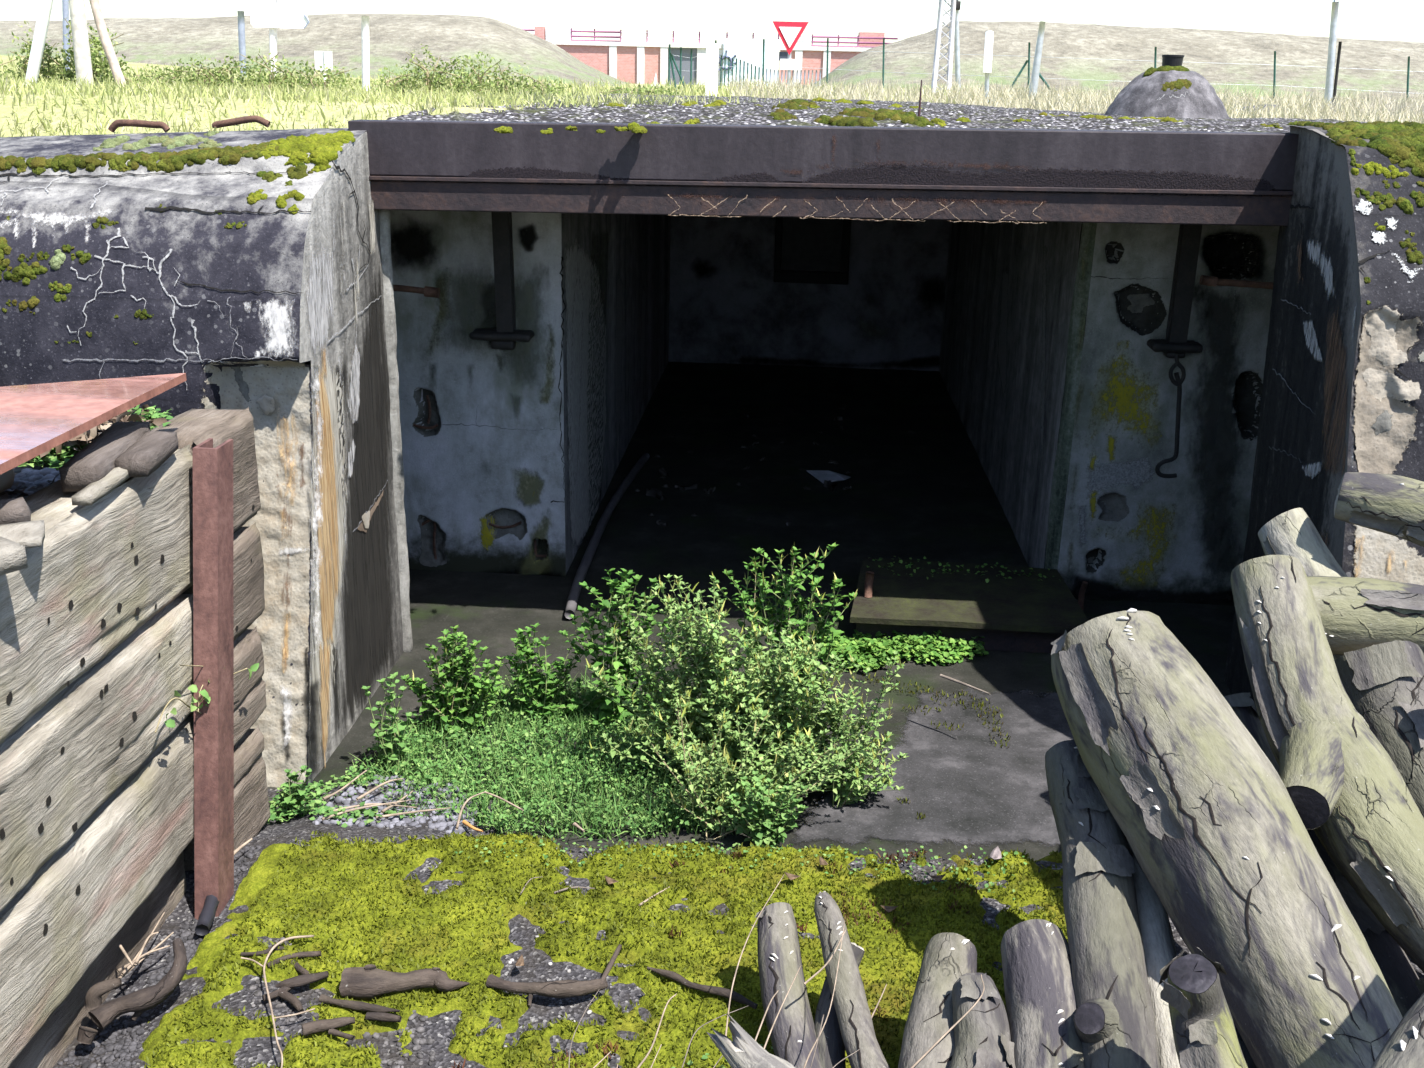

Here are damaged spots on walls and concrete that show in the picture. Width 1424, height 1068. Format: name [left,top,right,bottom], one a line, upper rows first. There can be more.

rust [465,166,629,185]
rust [667,172,787,218]
rust [801,163,1282,224]
crack [0,160,380,390]
spalling [1114,283,1167,336]
spalling [412,388,441,437]
spalling [1352,305,1422,474]
water stain [1069,341,1234,604]
spalling [1097,493,1129,522]
spalling [418,515,447,567]
spalling [486,508,548,561]
spalling [201,360,312,787]